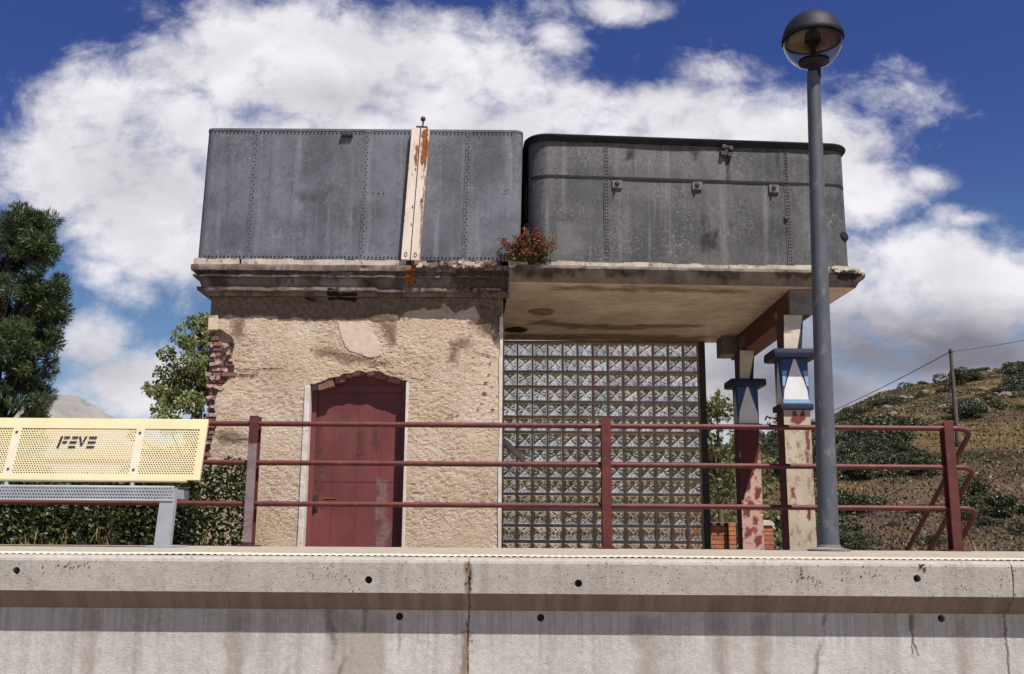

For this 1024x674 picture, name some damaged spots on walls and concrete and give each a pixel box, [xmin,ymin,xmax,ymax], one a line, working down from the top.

corrosion [414,128,429,243]
damp [198,265,741,342]
spalling [830,266,862,283]
spalling [204,330,236,460]
peeling [376,482,390,547]
peeling [744,487,762,547]
crack [465,559,473,674]
crack [1003,563,1014,674]